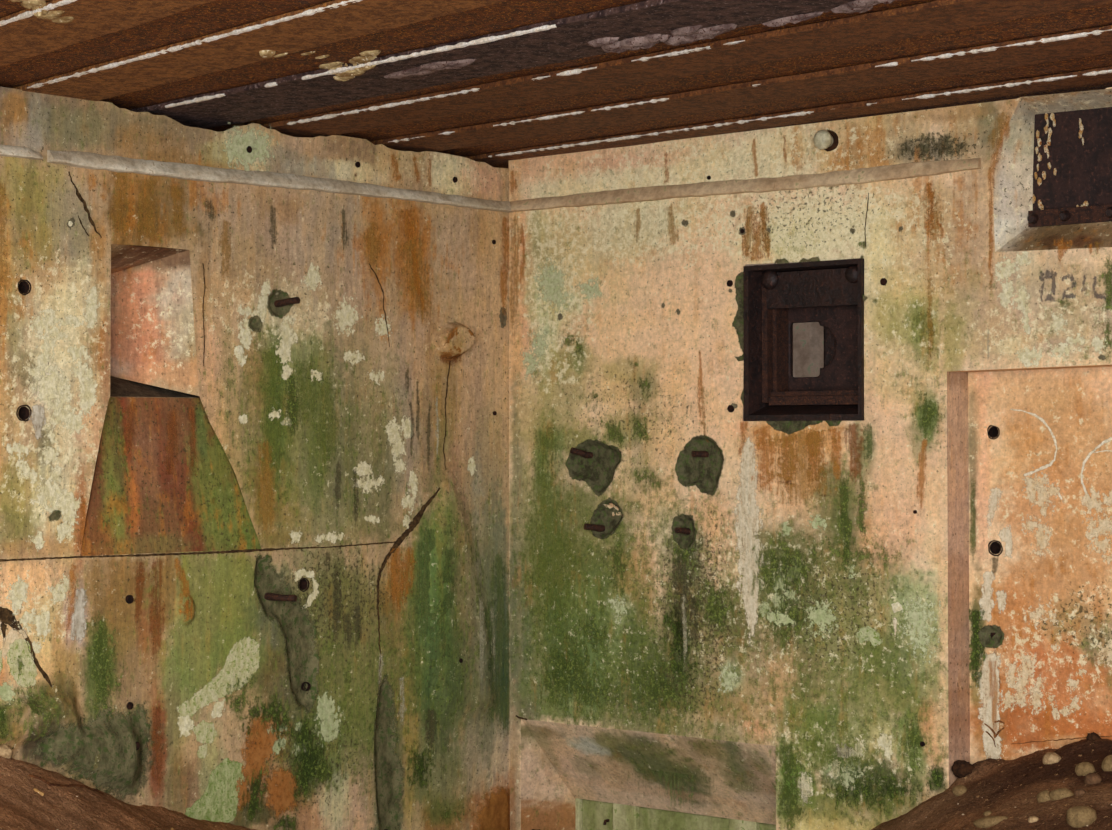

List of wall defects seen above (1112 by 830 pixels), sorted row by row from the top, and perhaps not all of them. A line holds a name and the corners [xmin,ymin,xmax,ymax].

crack [69,171,102,238]
corrosion [742,203,769,260]
crack [0,361,451,687]
damp [335,462,359,530]
damp [405,370,430,464]
spalling [565,439,623,539]
spalling [671,514,696,565]
spalling [675,435,724,496]
efflorescence [732,438,764,643]
corrosion [739,423,863,489]
damp [838,477,868,572]
damp [863,424,872,456]